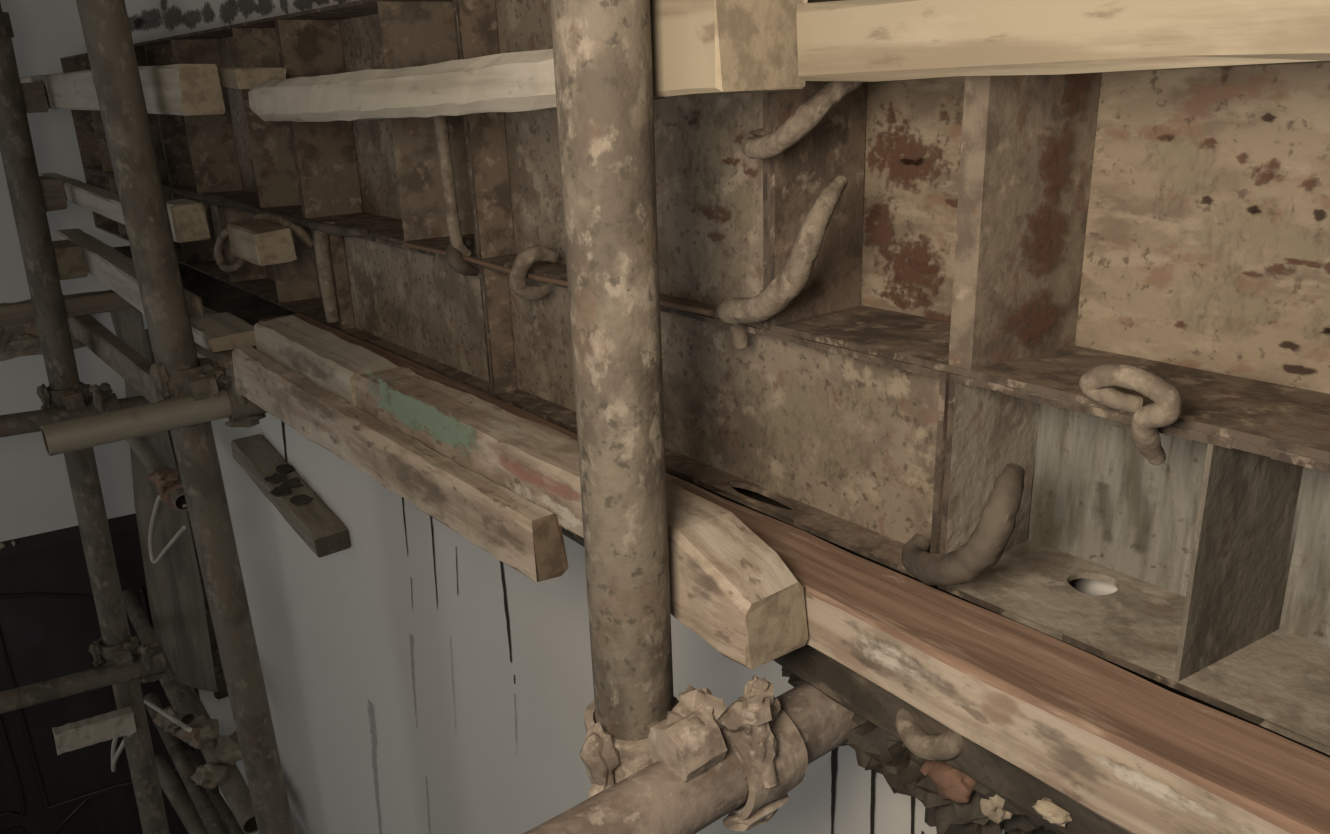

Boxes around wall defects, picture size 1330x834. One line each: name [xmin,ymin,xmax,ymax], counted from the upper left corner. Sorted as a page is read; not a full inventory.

rust [1236,153,1279,185]
rust [864,104,959,322]
rust [1242,258,1330,277]
rust [1279,341,1315,375]
water stain [402,497,438,606]
water stain [500,561,515,684]
water stain [897,792,924,834]
spalling [980,794,1013,824]
spalling [1032,797,1072,827]